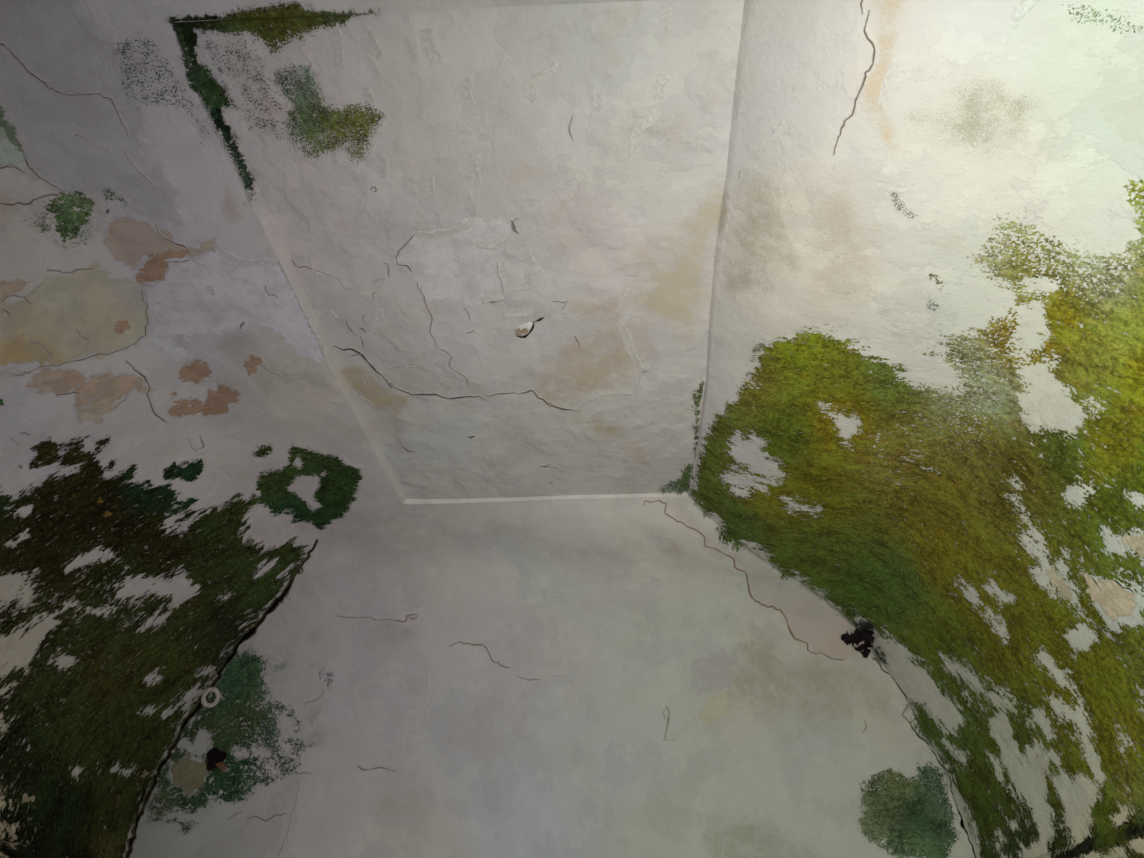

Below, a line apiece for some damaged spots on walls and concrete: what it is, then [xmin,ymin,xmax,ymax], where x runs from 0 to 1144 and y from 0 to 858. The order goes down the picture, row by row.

crack [833,0,876,155]
peeling [0,106,27,167]
crack [0,43,167,206]
peeling [103,215,219,285]
crack [292,234,580,412]
water stain [520,162,897,439]
peeling [24,368,153,425]
peeling [166,359,242,418]
crack [336,613,417,623]
crack [449,641,540,681]
crack [125,539,319,858]